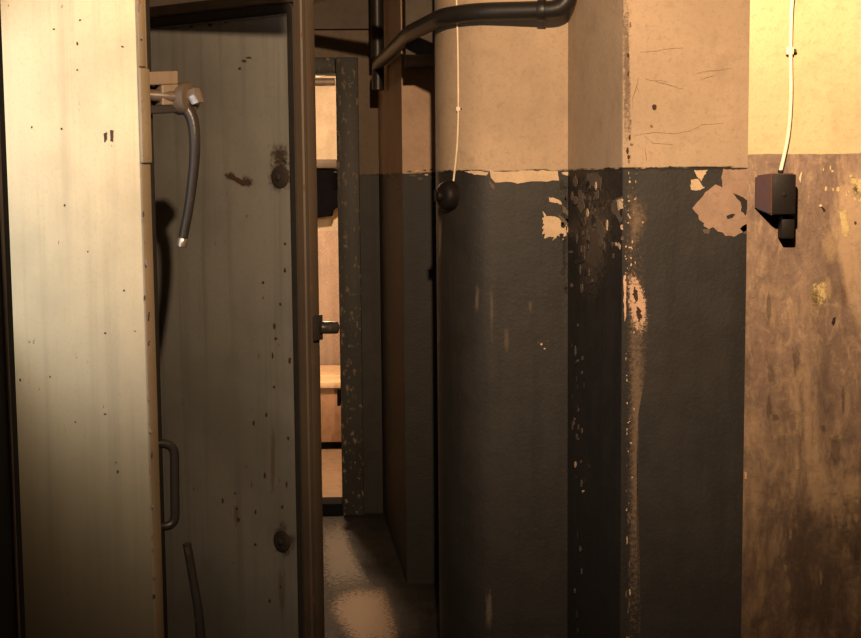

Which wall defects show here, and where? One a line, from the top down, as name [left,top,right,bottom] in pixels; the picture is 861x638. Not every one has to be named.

peeling [690,169,748,237]
peeling [825,175,861,203]
peeling [465,16,648,613]
leakage [811,282,828,310]